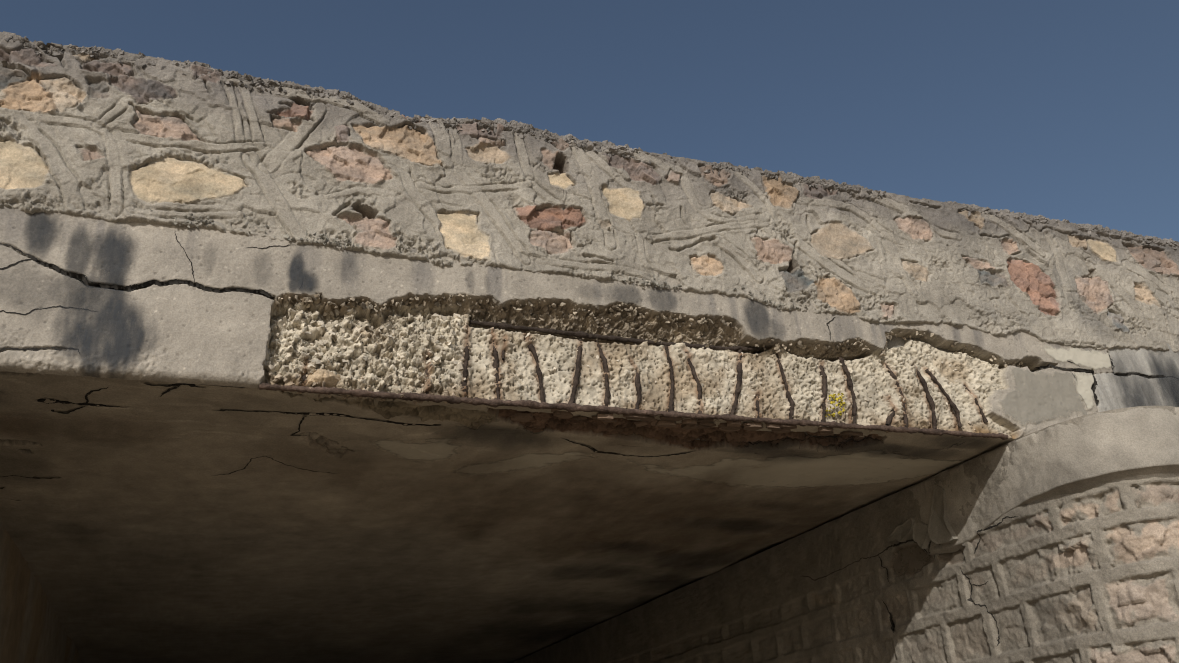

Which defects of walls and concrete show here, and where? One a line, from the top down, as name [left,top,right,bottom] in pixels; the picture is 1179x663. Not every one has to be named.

water stain [28,212,54,250]
water stain [63,231,145,375]
crack [0,233,275,315]
crack [0,346,80,354]
crack [37,387,127,414]
crack [144,383,441,476]
spalling [259,292,1058,488]
crack [1034,355,1178,404]
crack [802,516,1019,647]